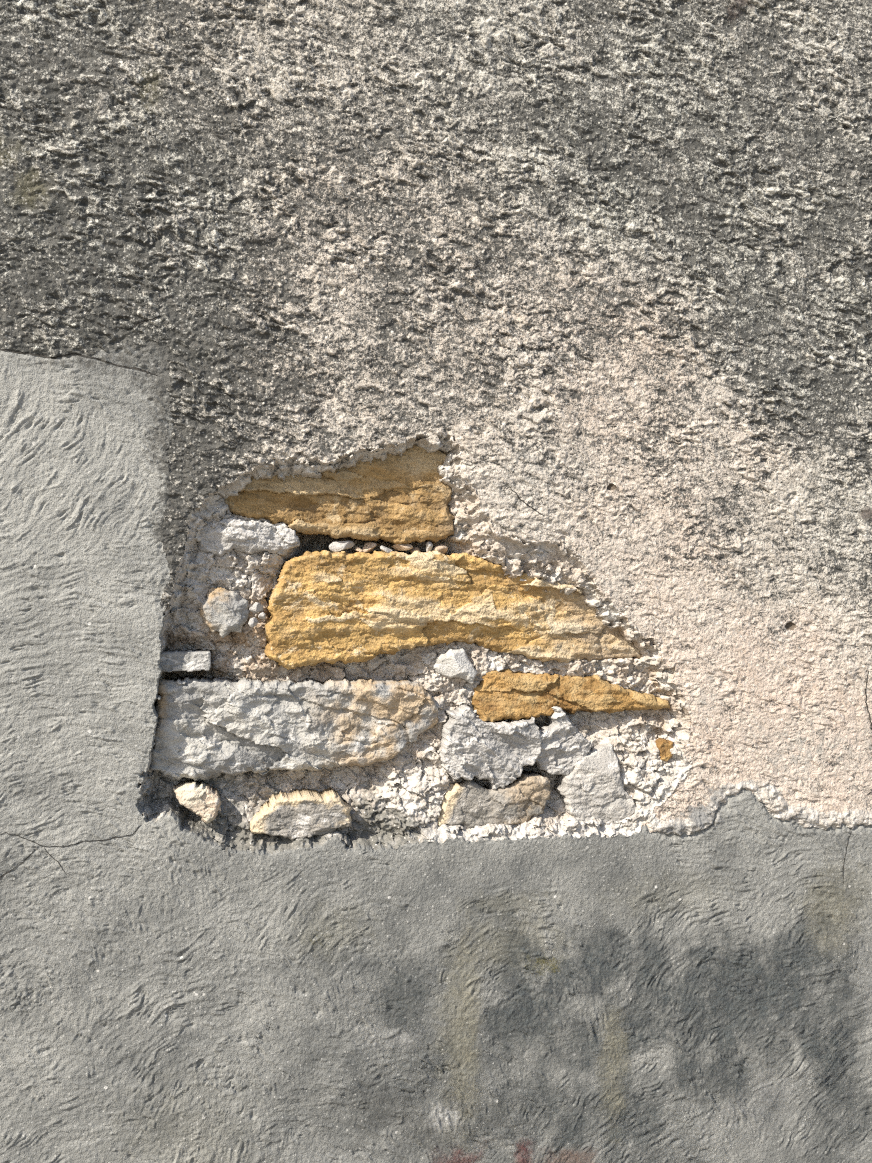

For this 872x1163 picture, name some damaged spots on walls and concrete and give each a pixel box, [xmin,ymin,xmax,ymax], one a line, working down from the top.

crack [127,316,161,330]
crack [0,349,158,376]
spalling [137,433,872,854]
crack [0,824,142,878]
water stain [458,915,856,1163]
water stain [428,1109,457,1136]